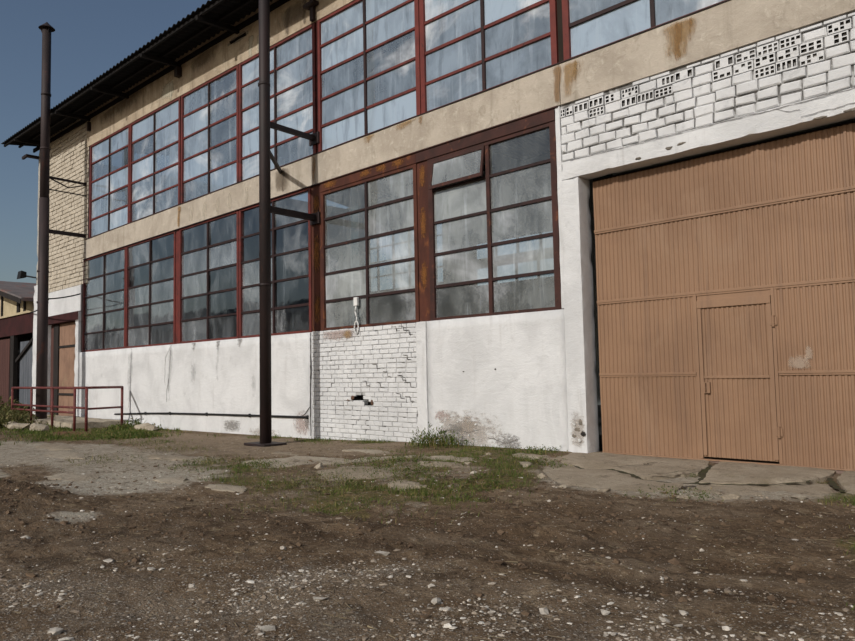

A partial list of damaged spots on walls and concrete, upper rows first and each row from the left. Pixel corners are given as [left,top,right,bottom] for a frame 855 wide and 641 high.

rust [667,19,693,56]
rust [554,61,577,101]
spalling [347,364,411,405]
crack [608,462,845,492]